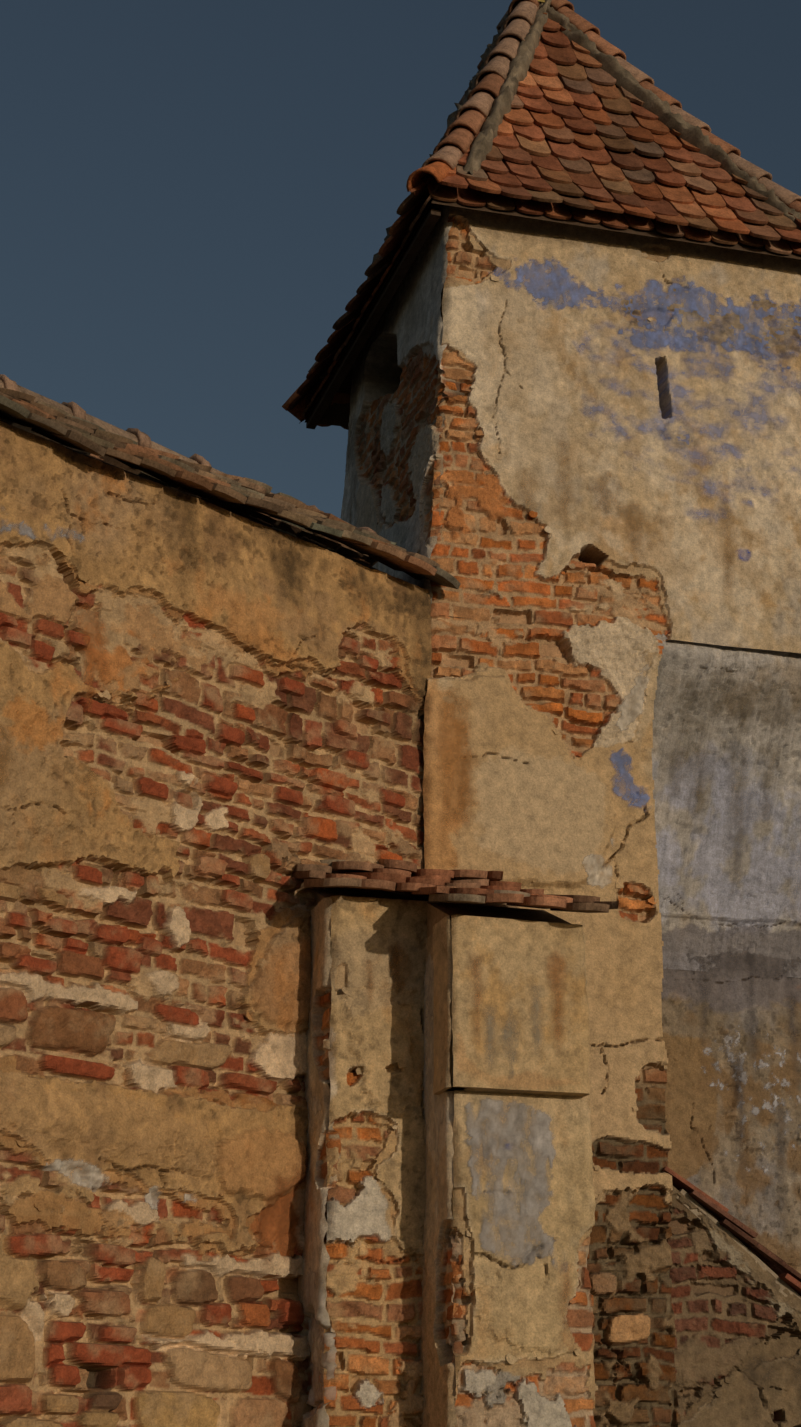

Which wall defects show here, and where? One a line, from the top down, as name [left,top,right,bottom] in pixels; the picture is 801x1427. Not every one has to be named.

crack [492,296,527,454]
peeling [444,214,801,459]
crack [243,633,359,686]
spalling [0,340,673,1111]
leakage [704,1031,801,1147]
spalling [0,1061,801,1427]